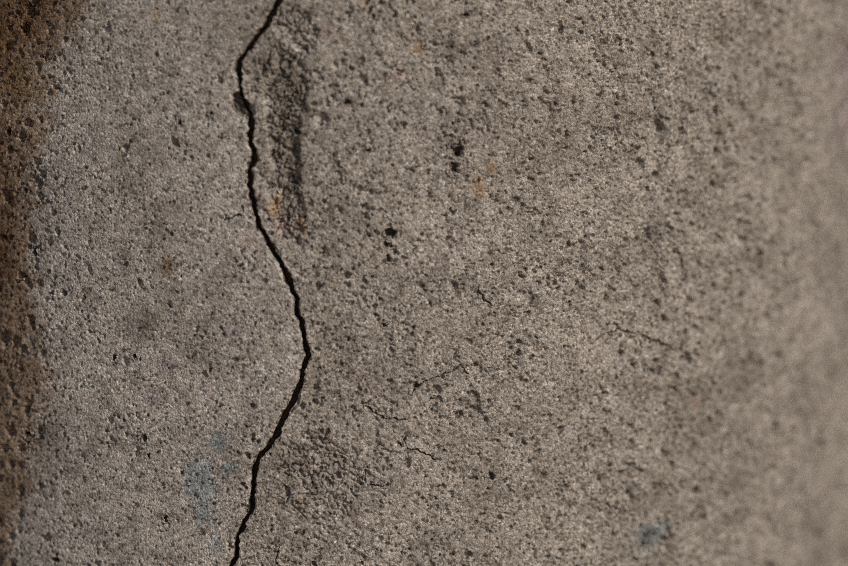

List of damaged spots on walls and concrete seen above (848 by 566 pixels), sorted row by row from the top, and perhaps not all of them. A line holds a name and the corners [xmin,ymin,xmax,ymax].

crack [224,0,320,566]